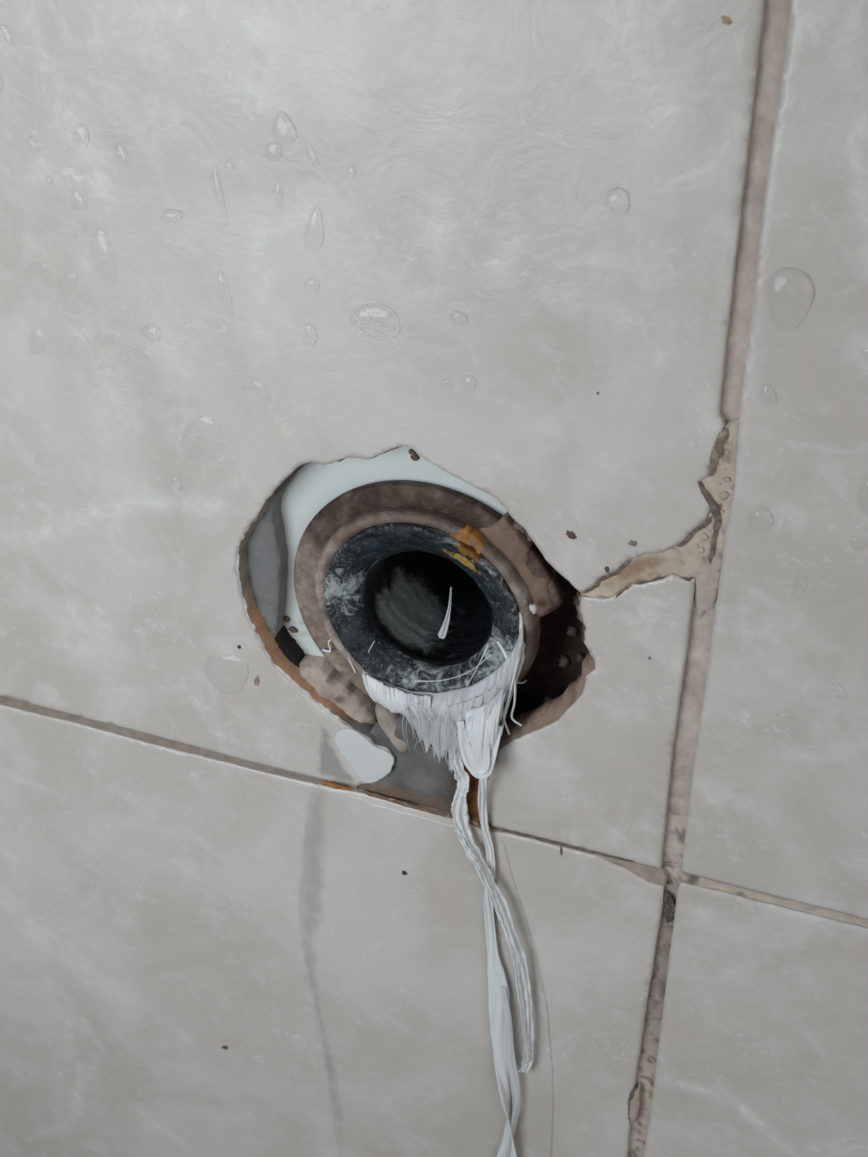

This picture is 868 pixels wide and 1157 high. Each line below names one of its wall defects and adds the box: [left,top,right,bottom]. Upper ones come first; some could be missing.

spalling [235,462,457,814]
rust [450,524,485,554]
spalling [479,499,596,751]
crack [580,417,739,622]